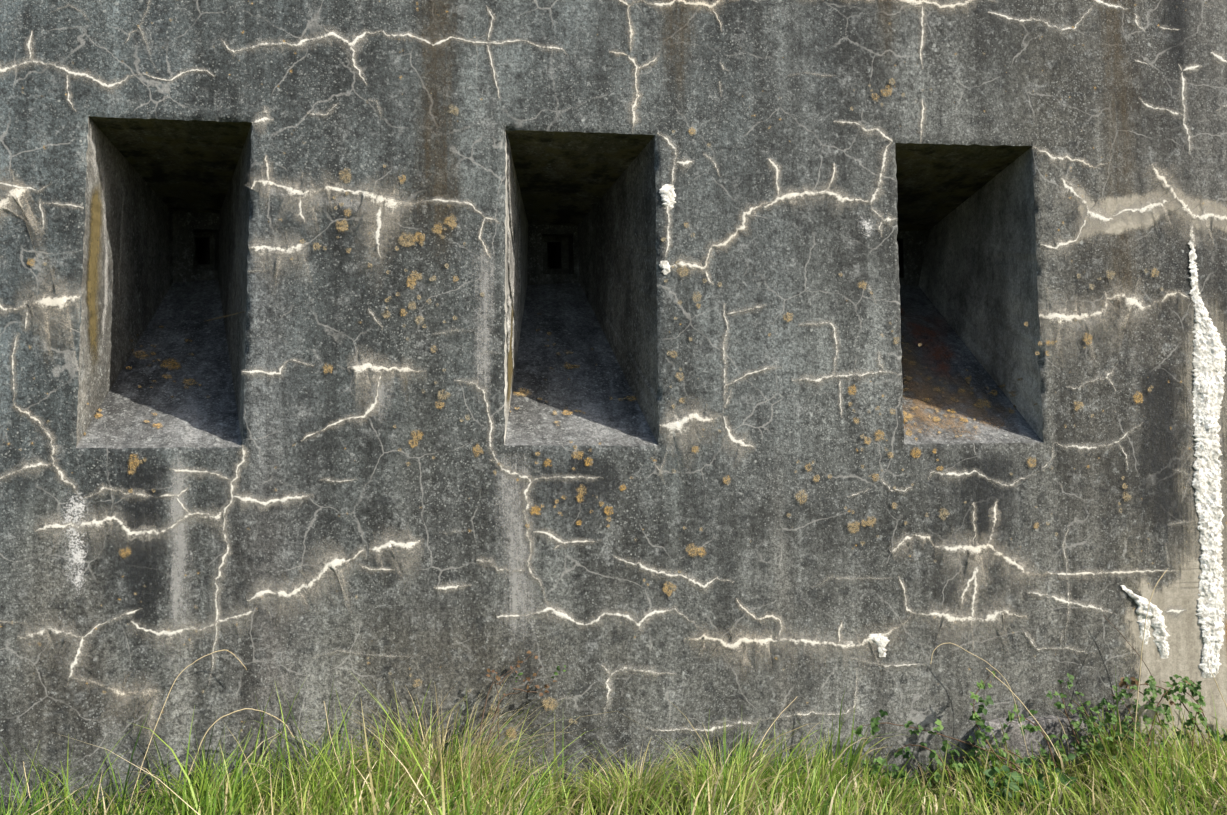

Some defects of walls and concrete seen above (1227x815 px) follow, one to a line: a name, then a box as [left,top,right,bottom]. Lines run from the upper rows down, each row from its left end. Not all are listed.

crack [0,7,568,114]
crack [866,0,1180,64]
crack [1135,52,1227,151]
crack [0,182,84,230]
crack [249,156,500,272]
crack [610,0,925,480]
crack [1033,146,1227,252]
crack [1039,289,1188,338]
crack [0,285,456,736]
crack [434,380,1188,733]
leakage [1072,187,1227,763]
leakage [867,633,889,657]